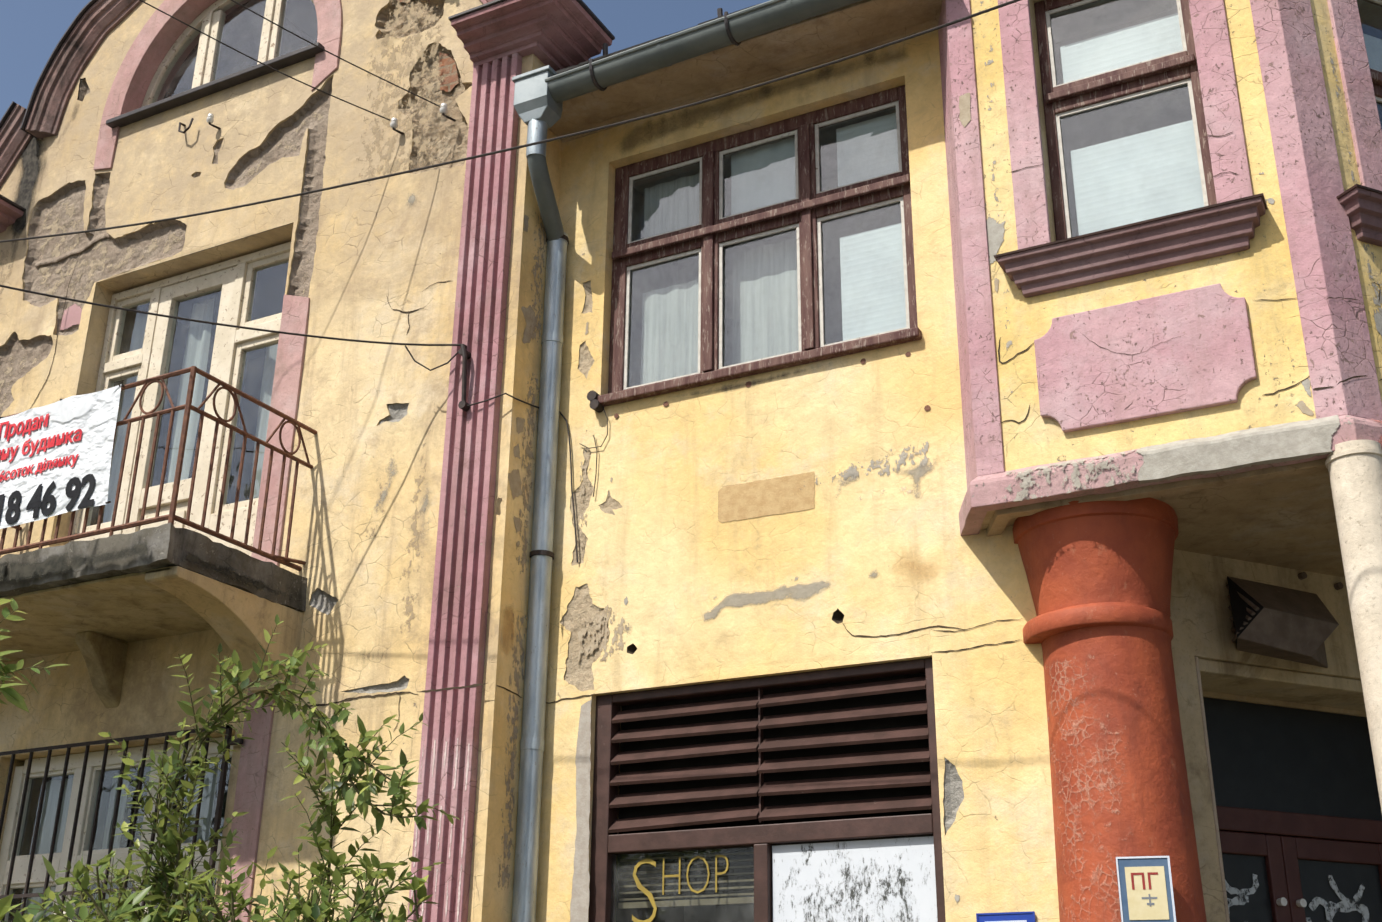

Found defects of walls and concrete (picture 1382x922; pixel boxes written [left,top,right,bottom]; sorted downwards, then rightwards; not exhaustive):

spalling [357,0,472,179]
spalling [191,74,334,297]
spalling [0,172,189,417]
peeling [578,281,594,379]
peeling [1363,244,1382,348]
peeling [570,430,622,566]
peeling [718,442,933,523]
peeling [1002,379,1340,502]
spalling [309,588,339,615]
crack [931,618,1022,653]
peeling [560,584,637,922]
spalling [943,757,964,835]